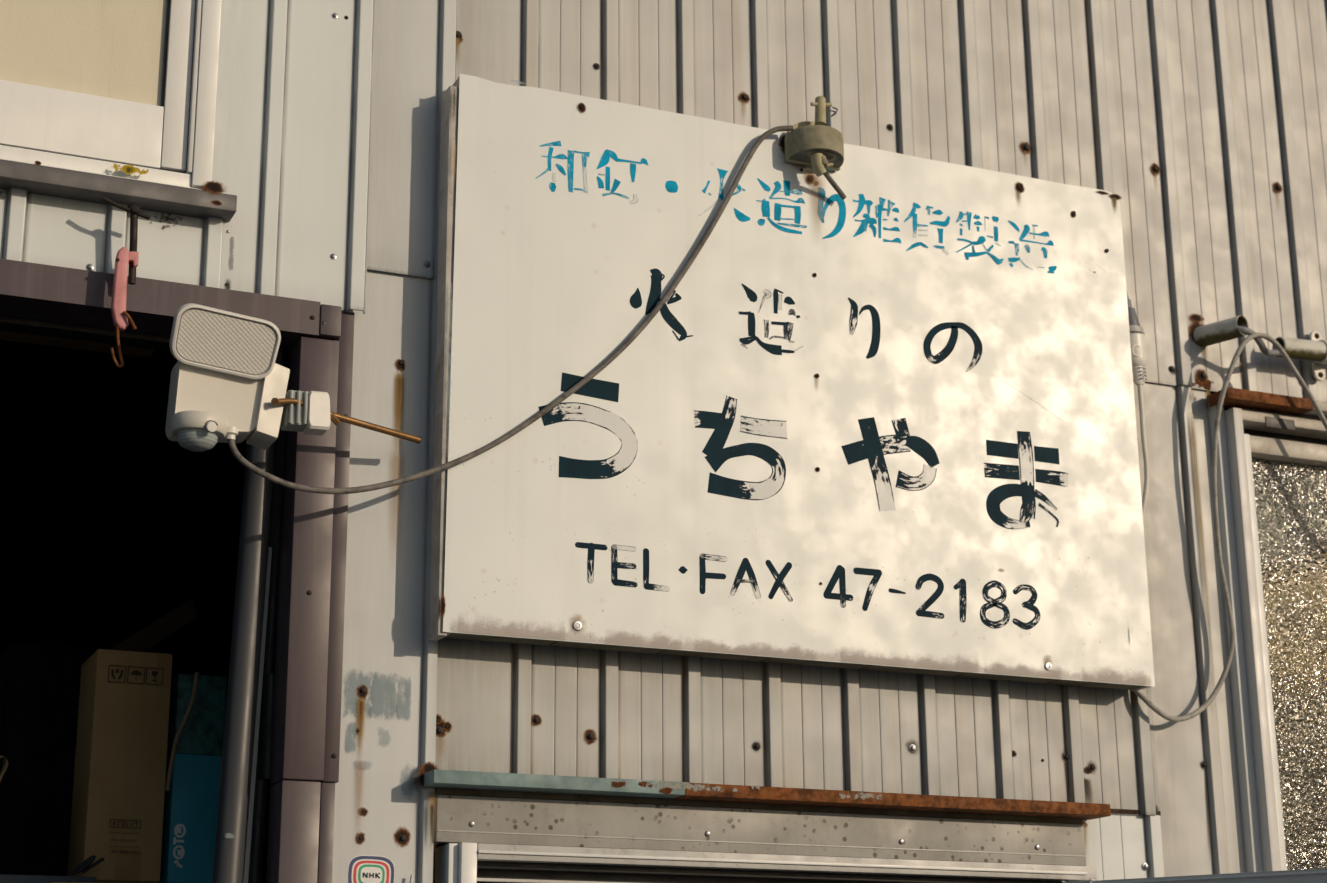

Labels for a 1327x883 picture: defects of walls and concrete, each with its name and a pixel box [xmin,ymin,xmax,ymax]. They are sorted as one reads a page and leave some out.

rust [202,181,225,205]
rust [1189,314,1214,409]
rust [395,359,405,431]
rust [1191,420,1208,607]
rust [357,685,368,744]
rust [436,714,452,738]
rust [1084,763,1096,802]
rust [394,828,410,847]